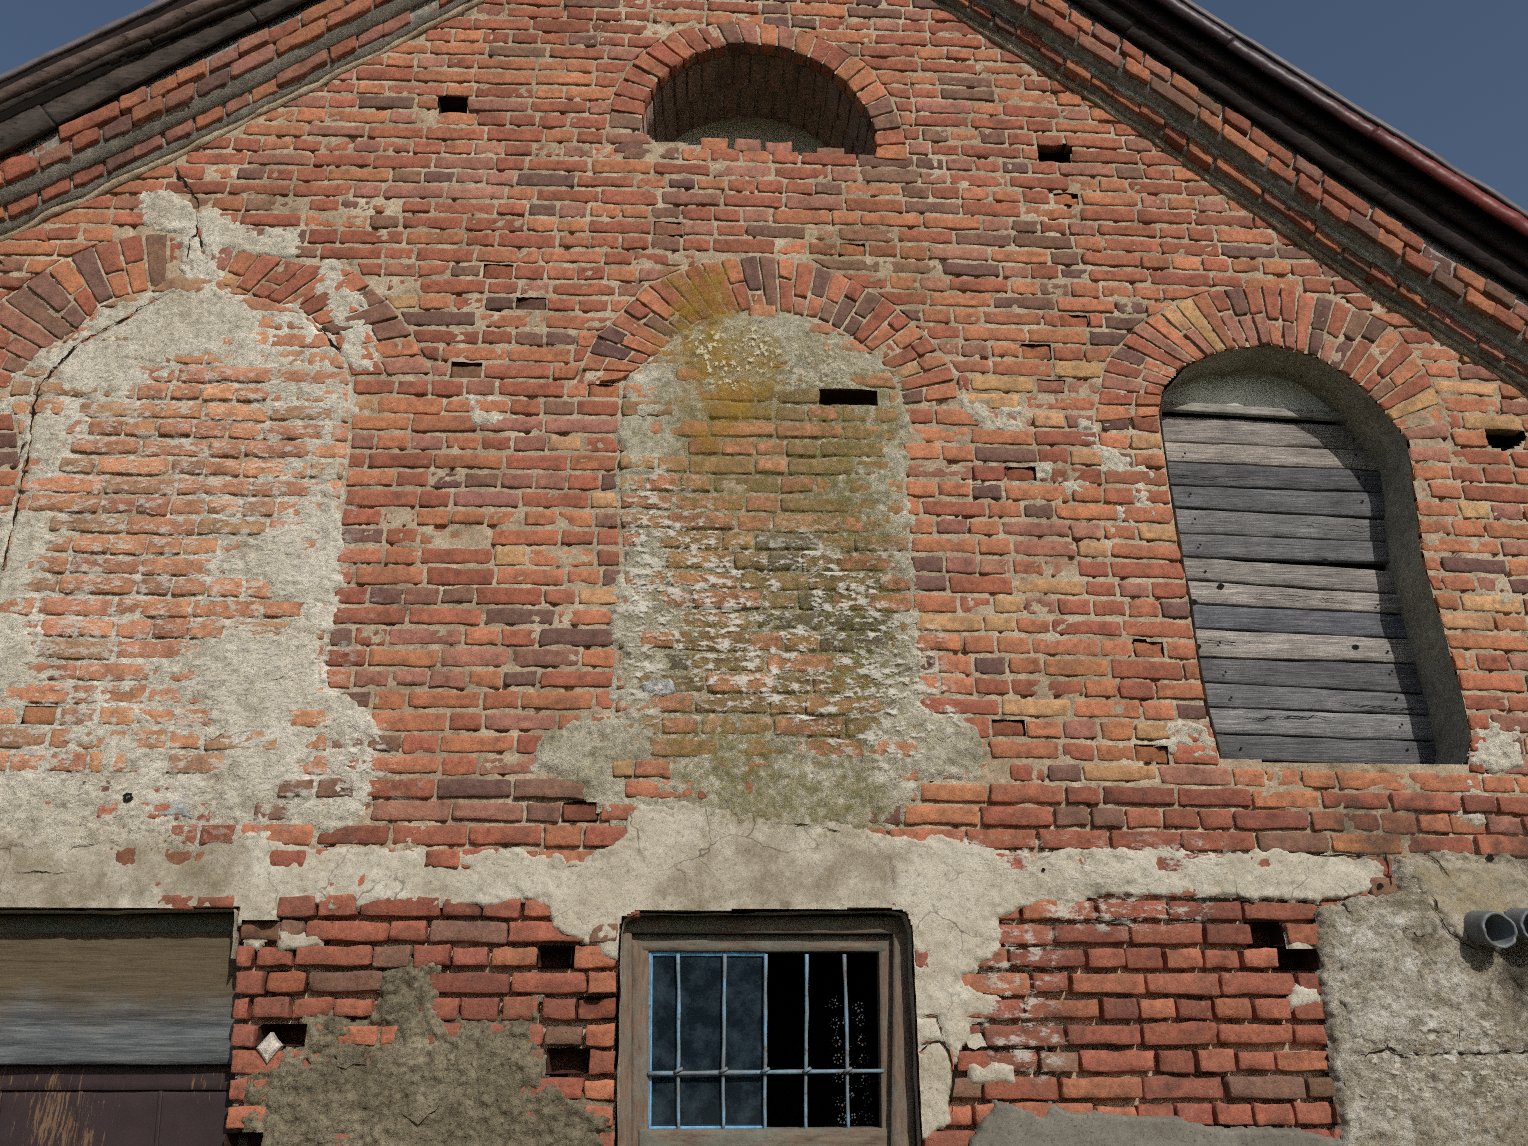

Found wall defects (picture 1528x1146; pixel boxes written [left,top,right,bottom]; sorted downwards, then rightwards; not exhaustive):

crack [175,162,203,258]
crack [1,292,172,571]
flaking render [0,282,1385,1146]
damp [626,469,956,770]